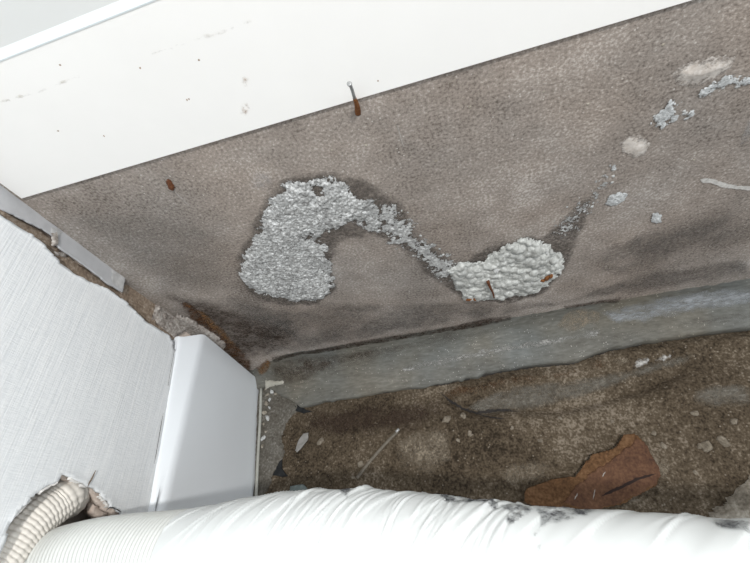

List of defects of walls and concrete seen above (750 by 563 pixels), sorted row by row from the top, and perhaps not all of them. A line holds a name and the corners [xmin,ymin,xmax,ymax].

water stain [189,303,297,353]
water stain [273,306,510,362]
water stain [611,292,750,321]